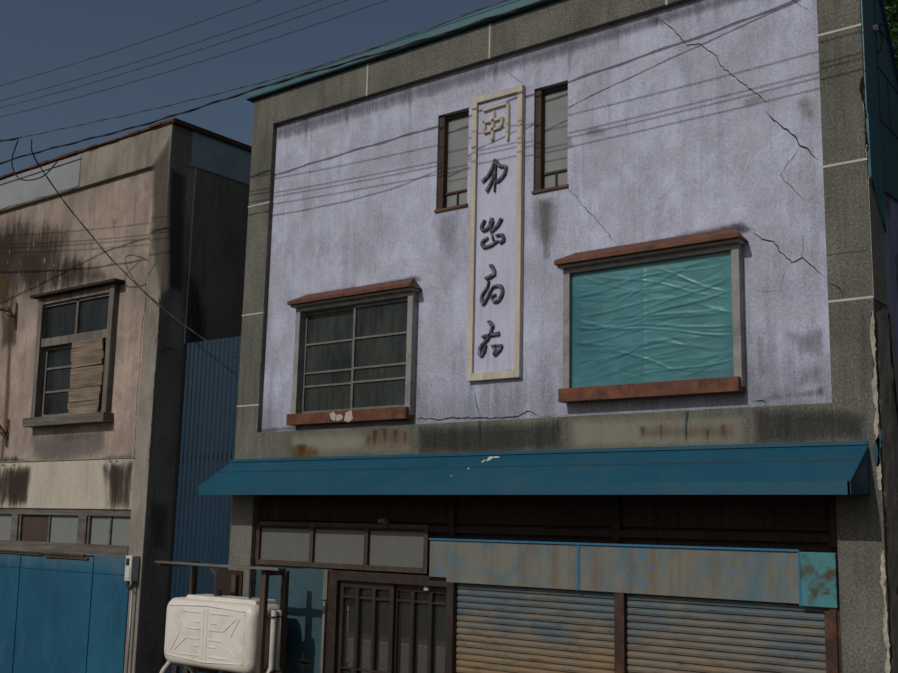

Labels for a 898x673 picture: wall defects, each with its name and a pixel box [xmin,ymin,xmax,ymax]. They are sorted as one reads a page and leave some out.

crack [662,19,819,201]
damp [0,223,104,307]
crack [753,231,843,297]
damp [0,458,29,506]